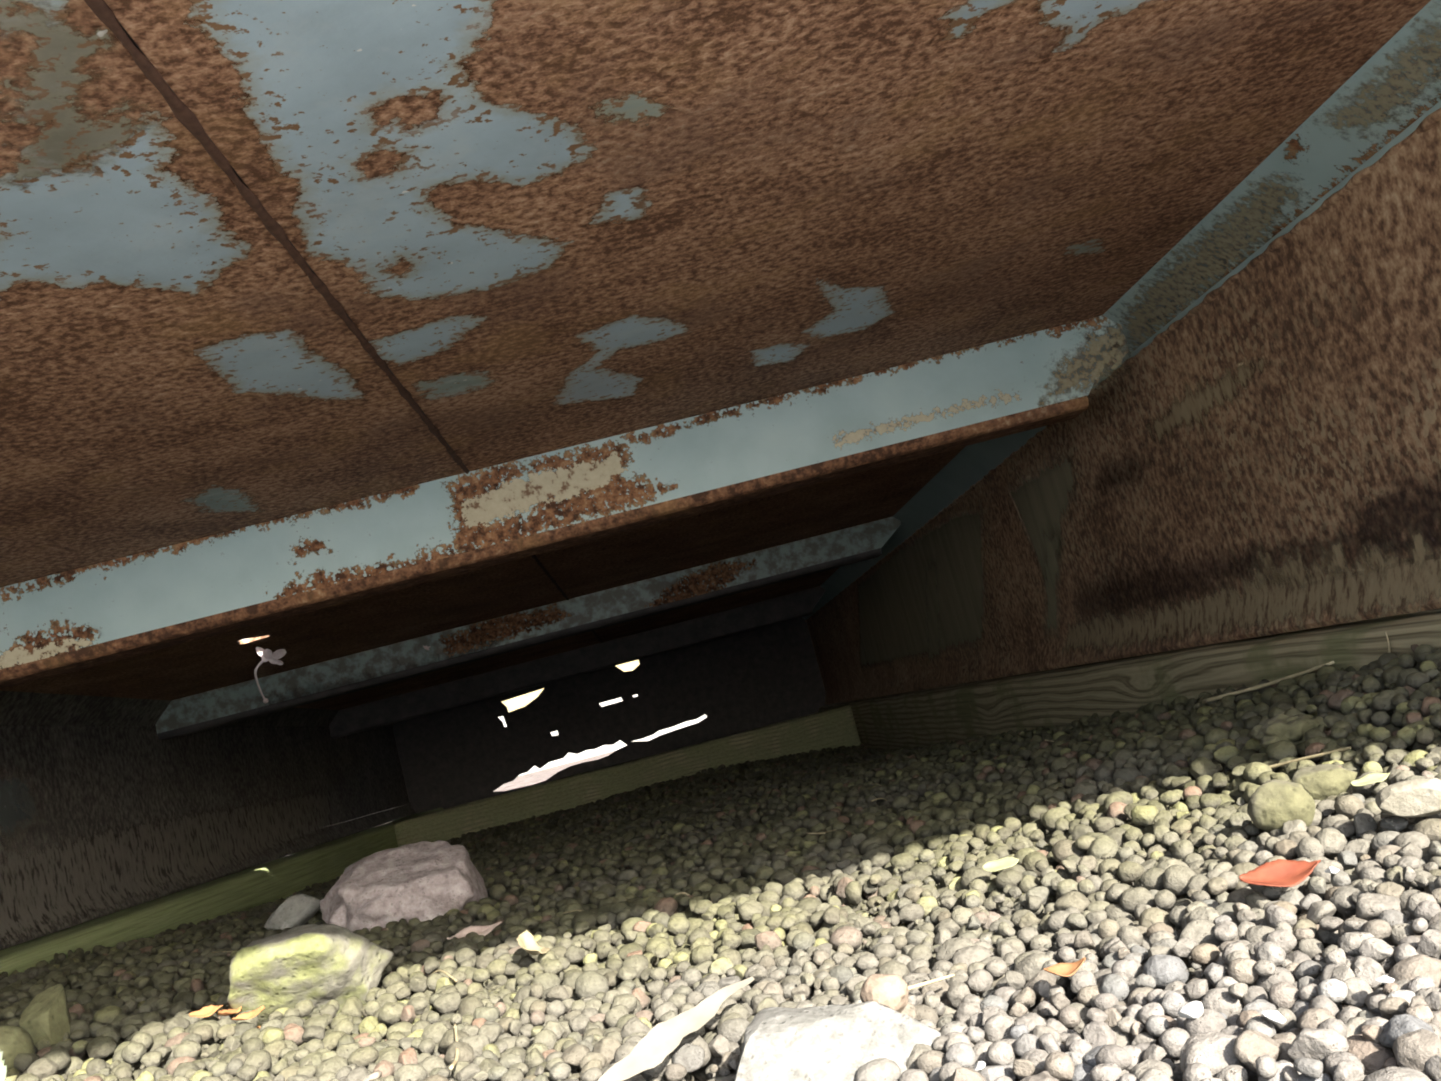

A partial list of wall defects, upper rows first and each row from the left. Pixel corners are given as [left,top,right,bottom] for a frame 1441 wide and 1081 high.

peeling [1036,0,1174,53]
peeling [0,0,252,300]
peeling [183,0,674,301]
peeling [193,329,366,401]
peeling [368,314,490,366]
peeling [553,314,693,406]
rust [0,19,1441,608]
peeling [747,278,896,369]
peeling [461,451,629,528]
peeling [0,637,98,670]
rust [0,619,100,669]
rust [438,603,572,658]